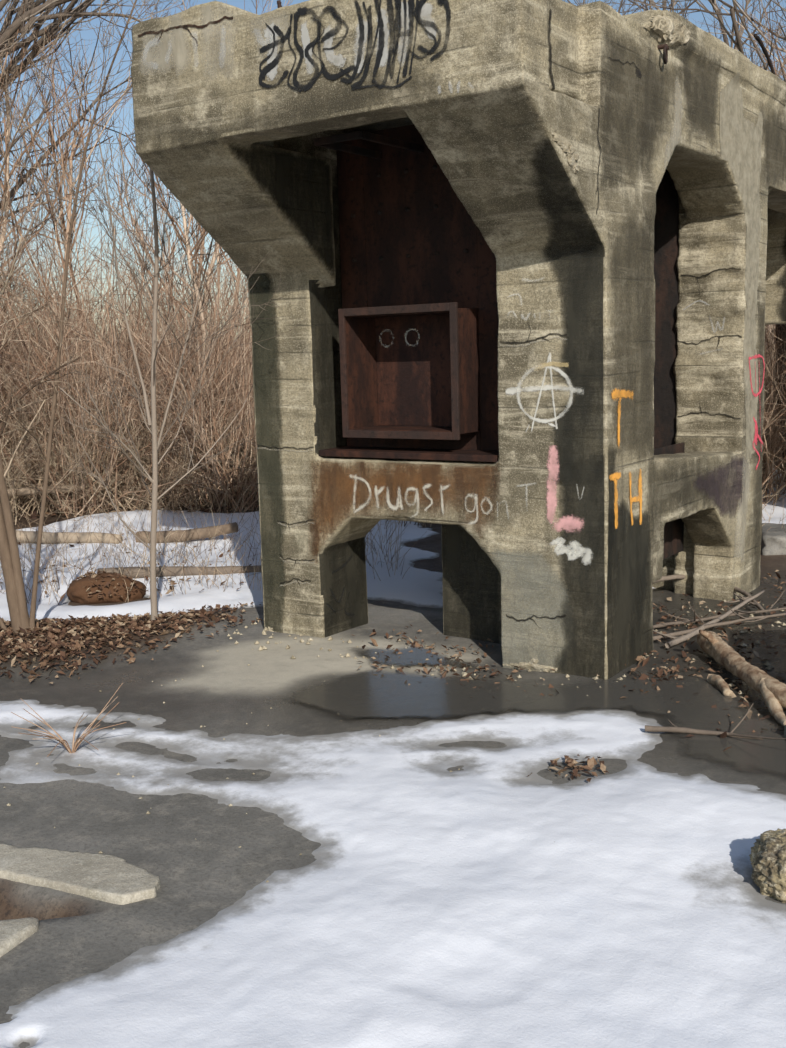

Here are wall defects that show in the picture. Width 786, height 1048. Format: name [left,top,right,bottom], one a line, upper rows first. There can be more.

crack [138,16,233,46]
crack [547,9,555,90]
damp [603,40,720,177]
damp [763,115,786,184]
crack [681,267,741,295]
crack [500,324,567,344]
damp [534,139,765,680]
crack [506,614,566,628]